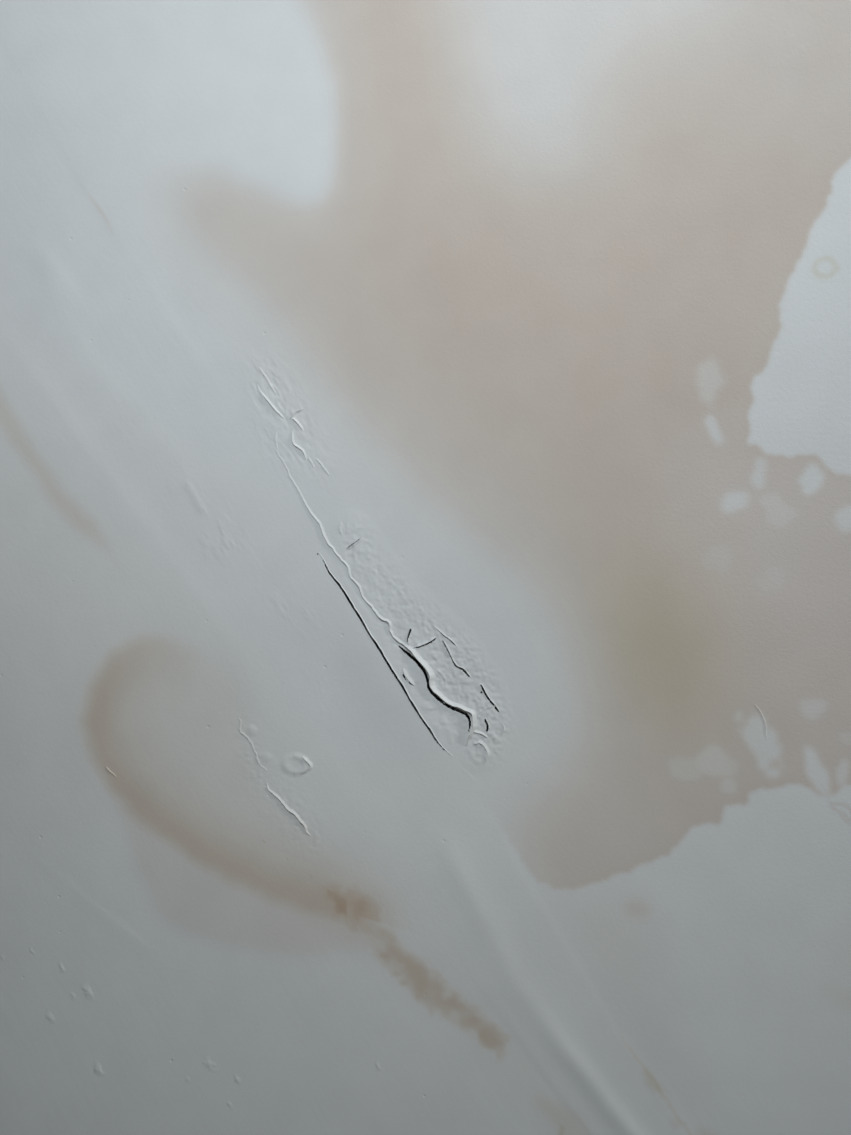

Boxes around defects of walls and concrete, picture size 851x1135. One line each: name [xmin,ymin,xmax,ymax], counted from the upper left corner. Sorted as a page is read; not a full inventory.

water stain [0,501,552,1135]
water stain [154,0,851,894]